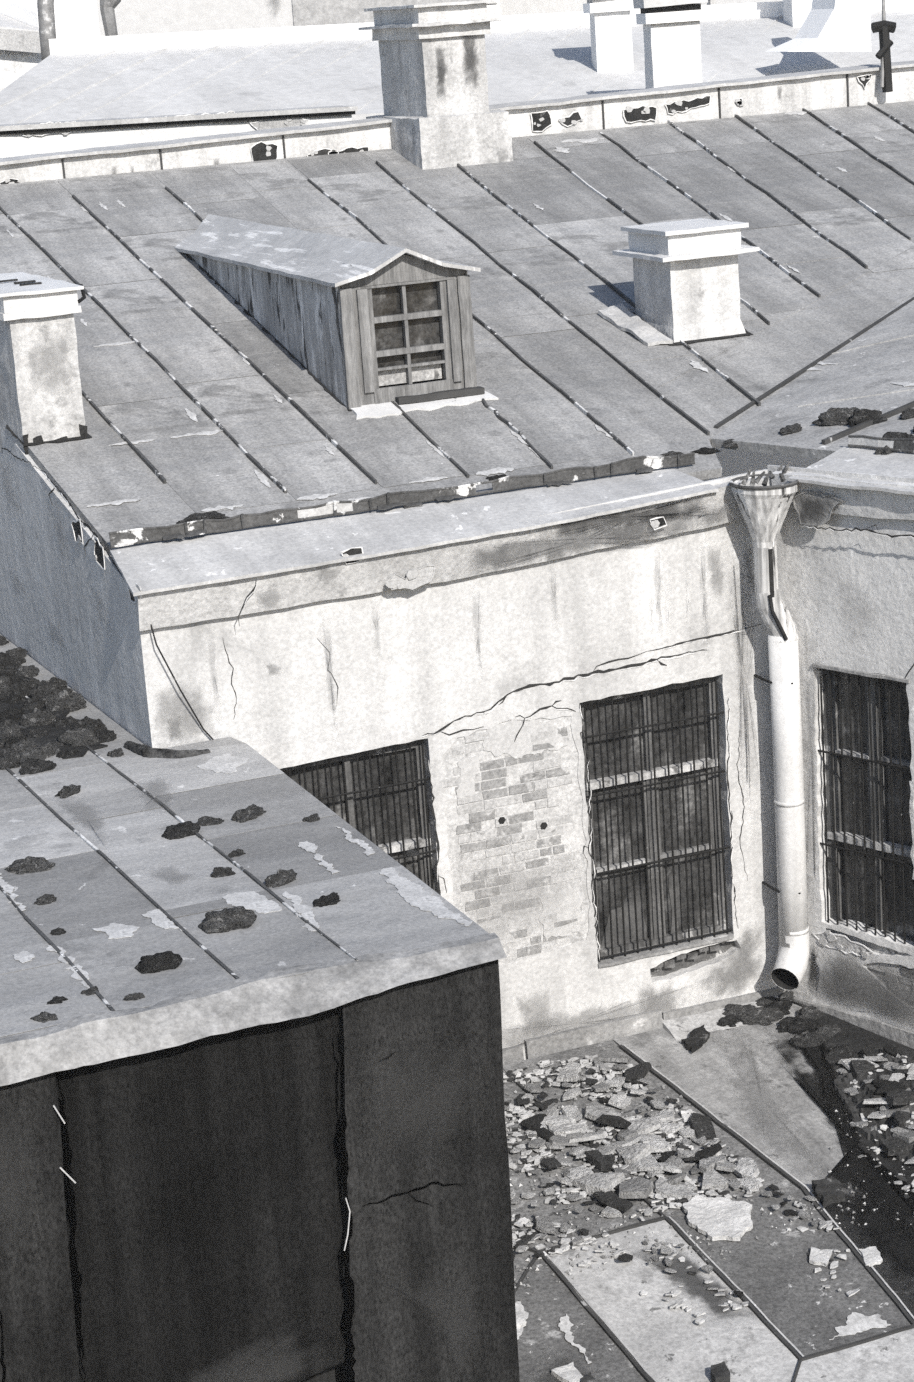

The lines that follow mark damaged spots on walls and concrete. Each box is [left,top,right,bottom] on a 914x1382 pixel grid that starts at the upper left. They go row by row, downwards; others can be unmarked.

crack [801,524,914,538]
crack [223,582,257,717]
crack [321,643,339,709]
flaking render [380,716,590,966]
crack [422,624,760,961]
flaking render [812,928,914,1007]